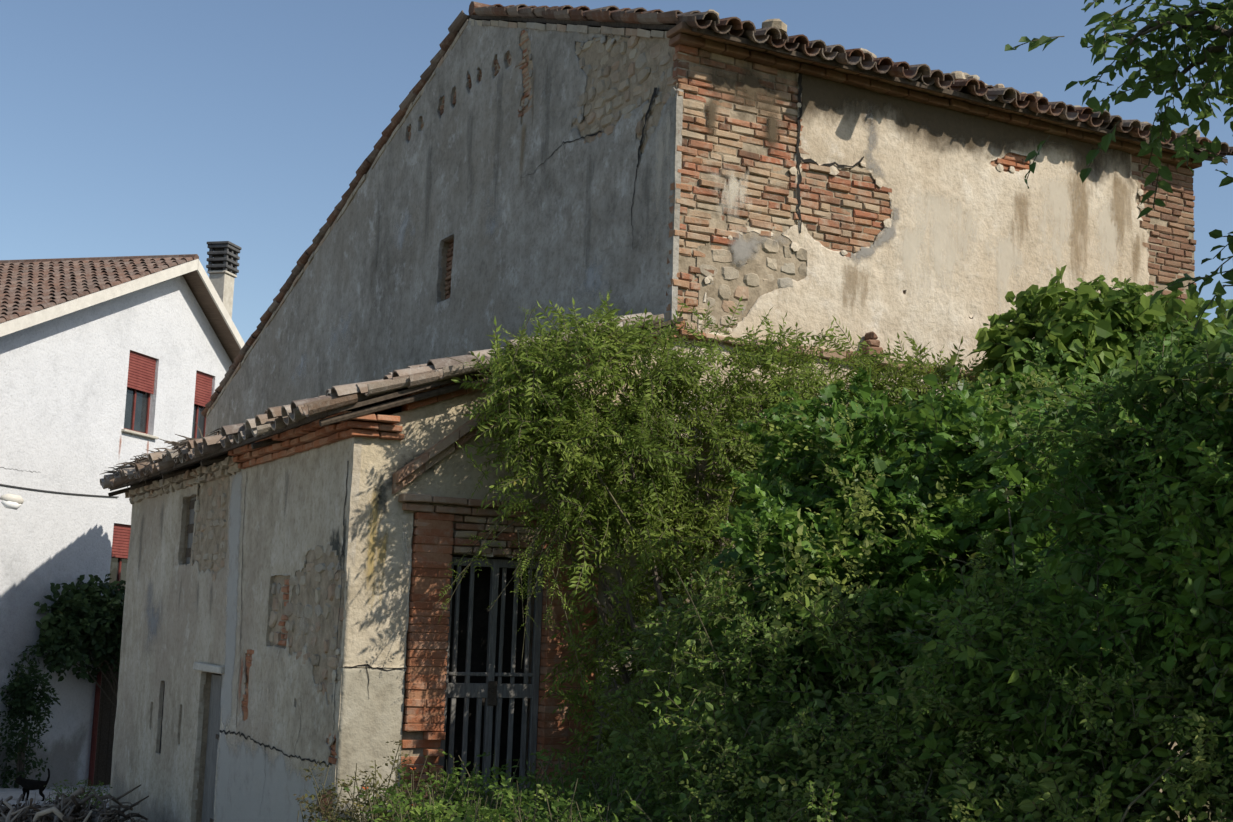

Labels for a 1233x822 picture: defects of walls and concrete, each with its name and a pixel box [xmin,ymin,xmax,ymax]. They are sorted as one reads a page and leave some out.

crack [631,87,657,249]
flaking render [569,28,893,343]
crack [797,73,864,233]
leakage [799,73,1133,266]
flaking render [990,153,1030,173]
flaking render [190,476,230,582]
crack [220,479,331,803]
flaking render [278,544,347,705]
crack [333,461,405,730]